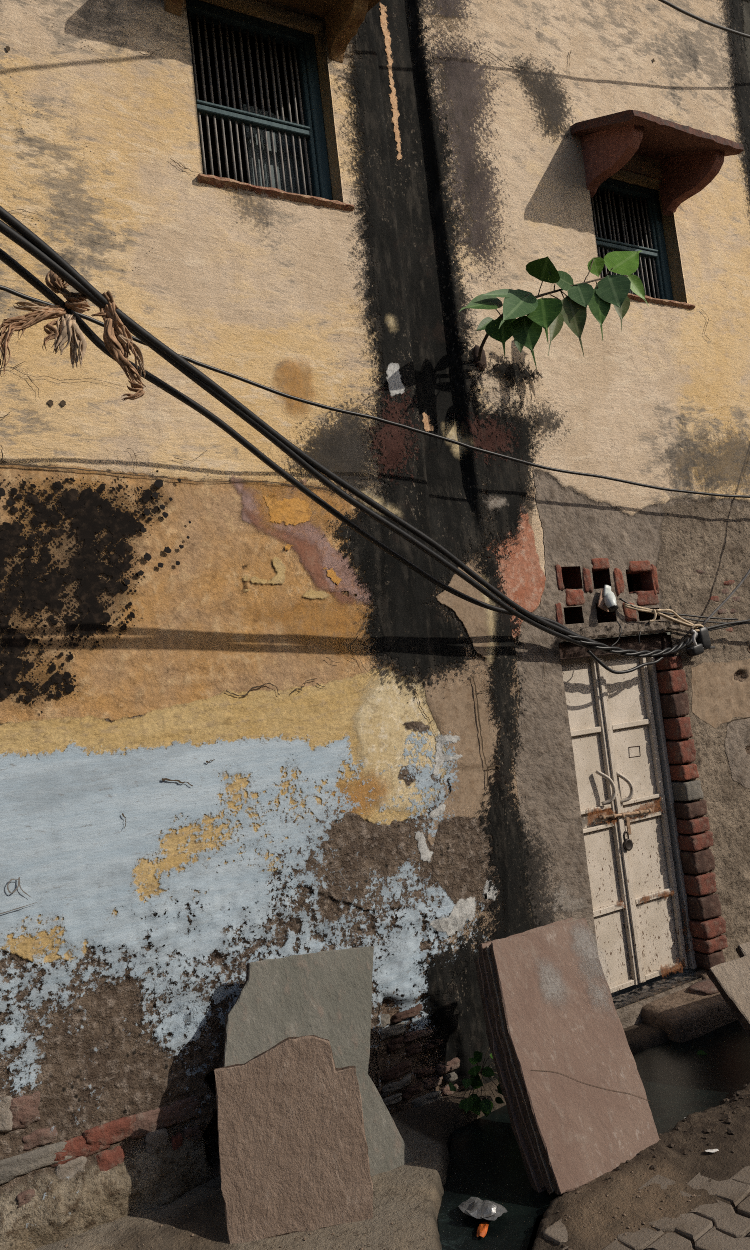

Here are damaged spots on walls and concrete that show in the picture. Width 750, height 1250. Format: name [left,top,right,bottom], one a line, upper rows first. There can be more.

damp [717,0,750,215]
damp [0,468,191,713]
damp [263,0,587,1092]
damp [661,417,750,510]
peeling [0,461,750,1208]